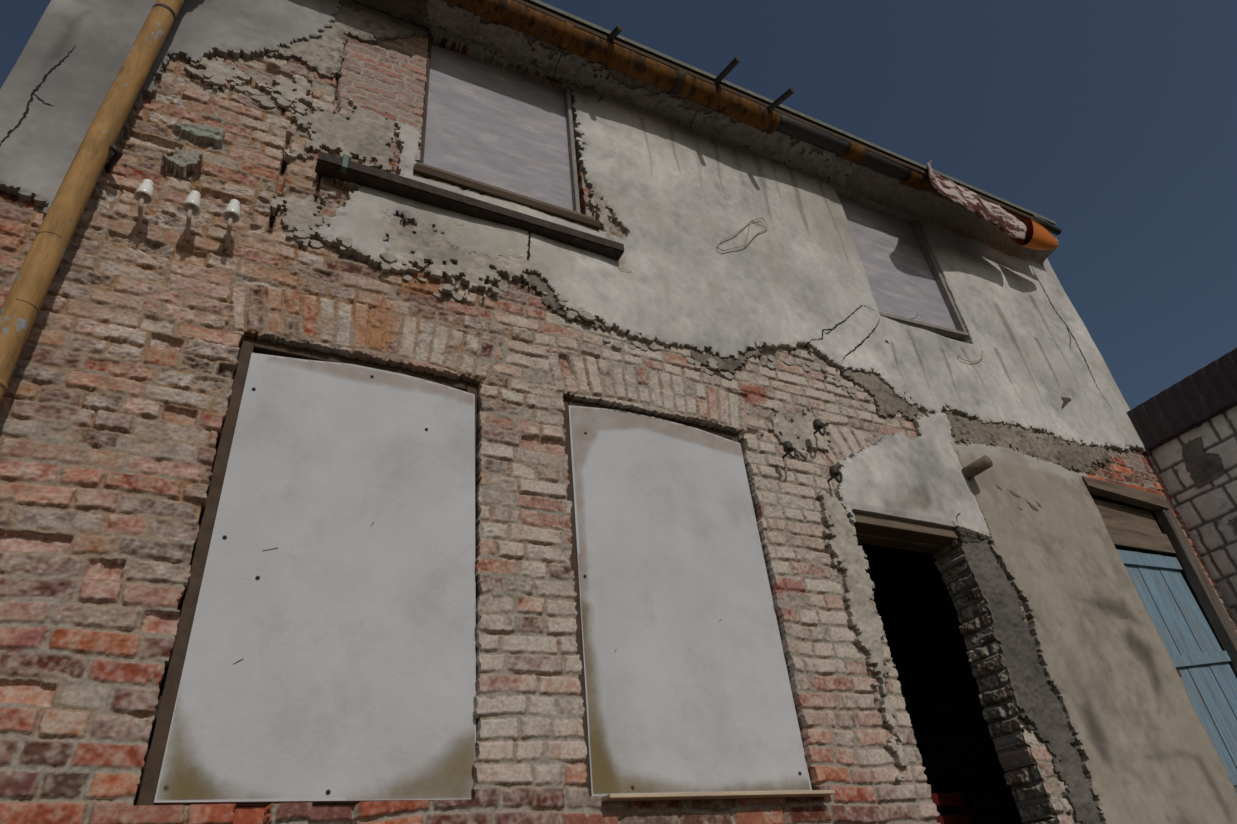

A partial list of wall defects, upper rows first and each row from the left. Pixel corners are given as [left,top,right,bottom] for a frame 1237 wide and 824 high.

crack [0,45,76,145]
flaking render [184,57,398,172]
flaking render [422,0,859,188]
flaking render [270,194,353,252]
flaking render [587,186,616,242]
flaking render [370,198,659,351]
crack [805,305,879,359]
flaking render [760,407,836,459]
flaking render [682,346,919,422]
flaking render [943,411,1110,475]
flaking render [815,490,910,781]
flaking render [950,526,1103,824]